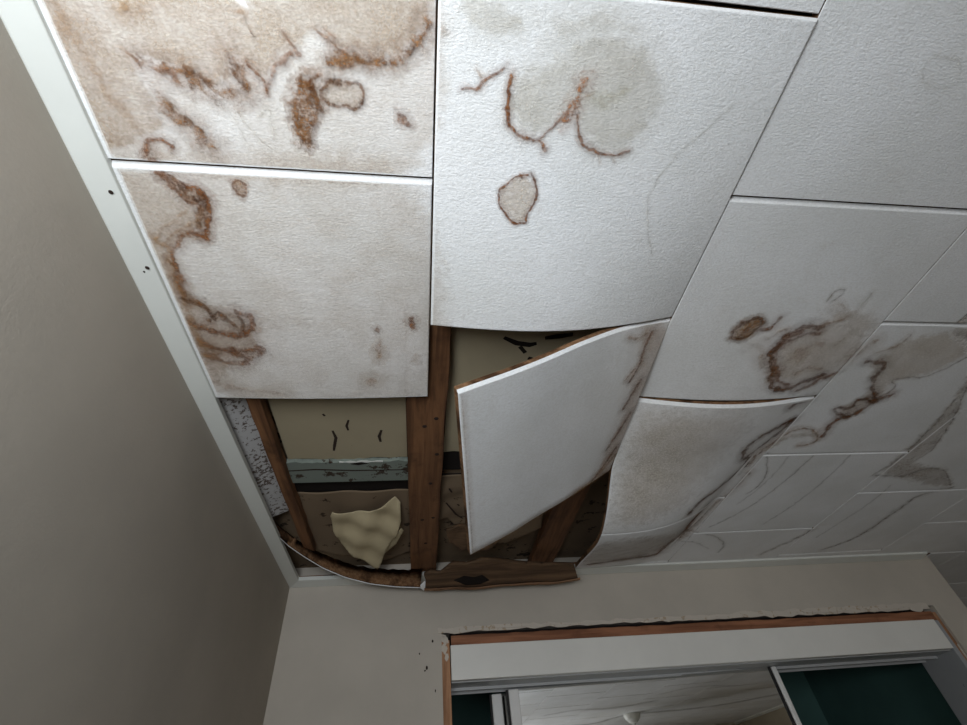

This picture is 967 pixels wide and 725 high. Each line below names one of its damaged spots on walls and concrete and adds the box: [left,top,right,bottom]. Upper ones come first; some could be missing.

damp [159,97,214,148]
damp [154,37,297,97]
damp [291,13,432,147]
damp [461,67,630,156]
damp [142,138,265,365]
damp [498,173,538,225]
spalling [219,398,580,591]
damp [587,316,896,565]